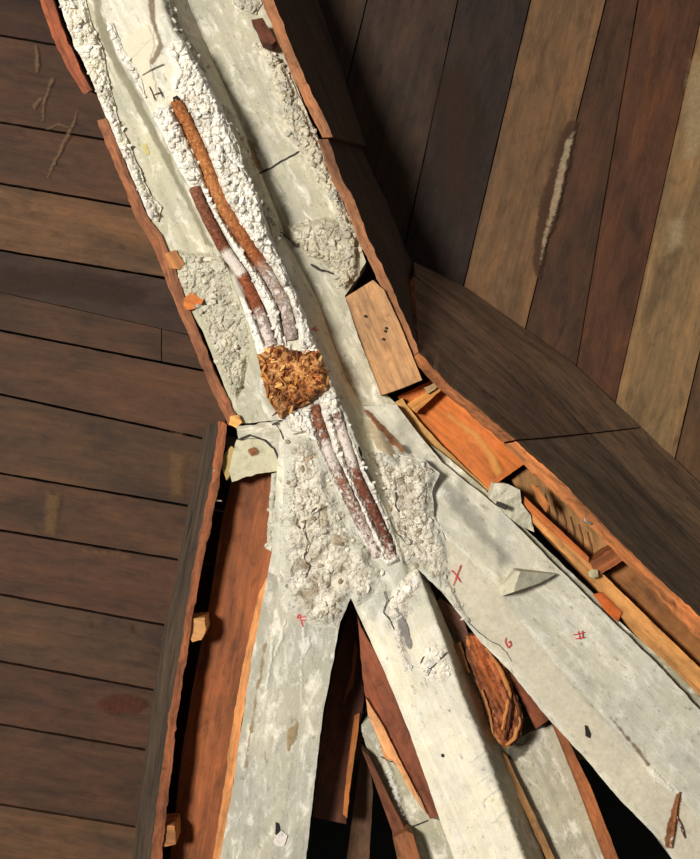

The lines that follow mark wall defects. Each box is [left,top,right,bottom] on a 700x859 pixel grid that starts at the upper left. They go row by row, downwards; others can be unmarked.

spalling [58,0,146,98]
peeling [102,101,133,158]
spalling [151,0,362,401]
crack [238,420,283,459]
rust [364,409,405,453]
spalling [264,390,471,684]